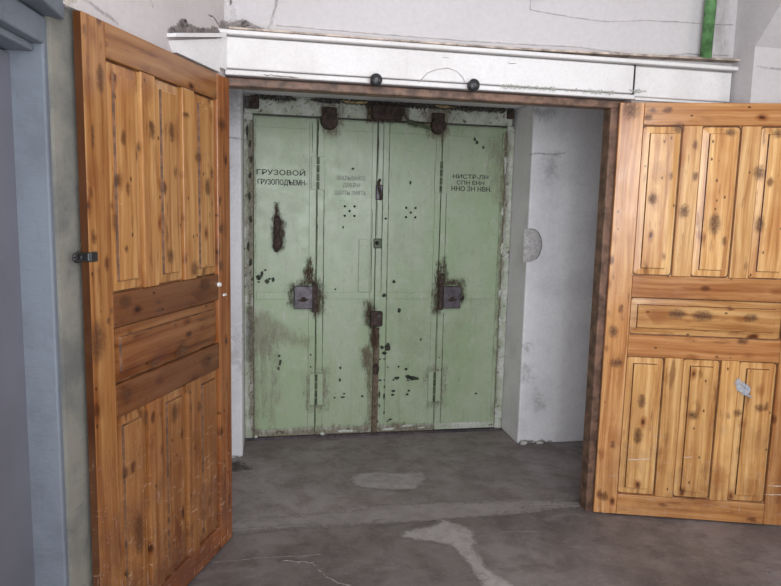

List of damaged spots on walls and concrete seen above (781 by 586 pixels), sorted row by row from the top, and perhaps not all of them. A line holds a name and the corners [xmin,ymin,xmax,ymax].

corrosion [272,204,285,252]
corrosion [288,190,325,354]
corrosion [432,260,465,333]
corrosion [363,300,386,433]
crack [283,560,352,586]